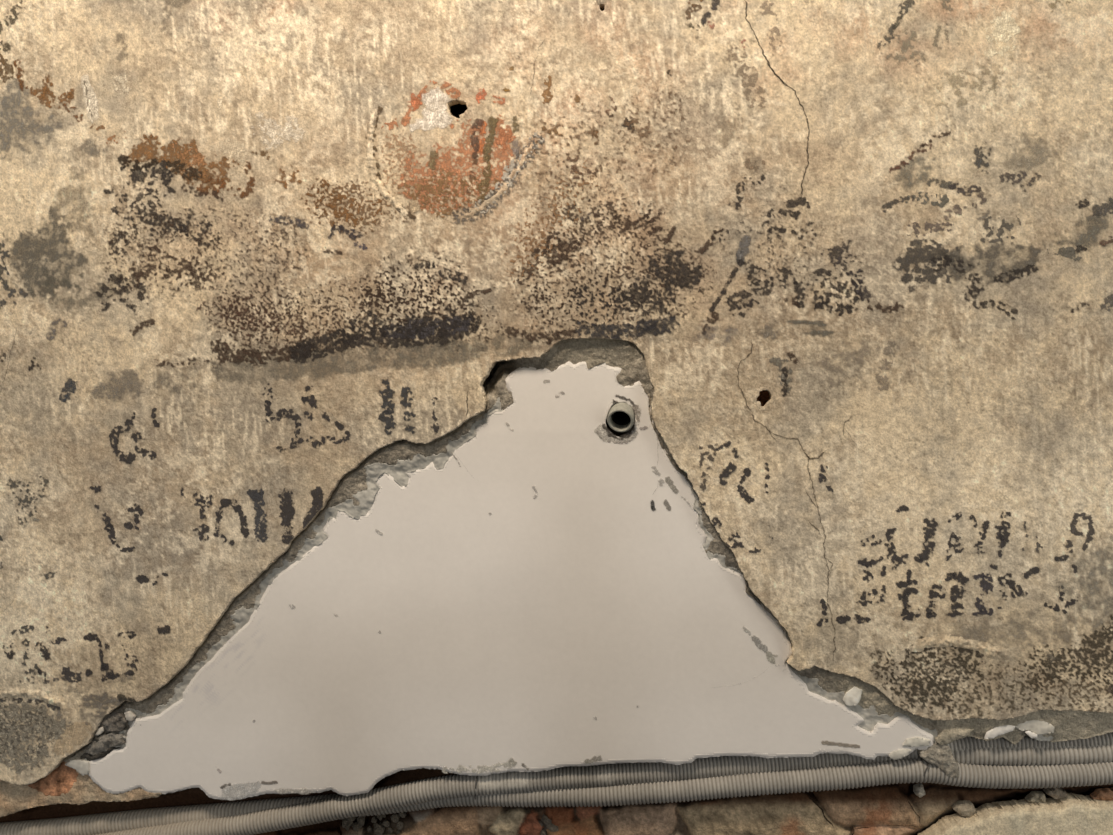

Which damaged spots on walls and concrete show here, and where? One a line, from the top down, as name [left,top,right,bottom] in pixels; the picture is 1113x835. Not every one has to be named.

rust [0,0,270,202]
rust [275,168,410,234]
water stain [0,153,904,368]
rust [541,75,553,104]
rust [496,90,689,283]
water stain [727,39,765,108]
crack [745,1,810,199]
water stain [882,132,1113,319]
water stain [769,352,799,396]
spalling [0,338,1113,817]
crack [737,340,857,658]
water stain [871,550,1113,717]